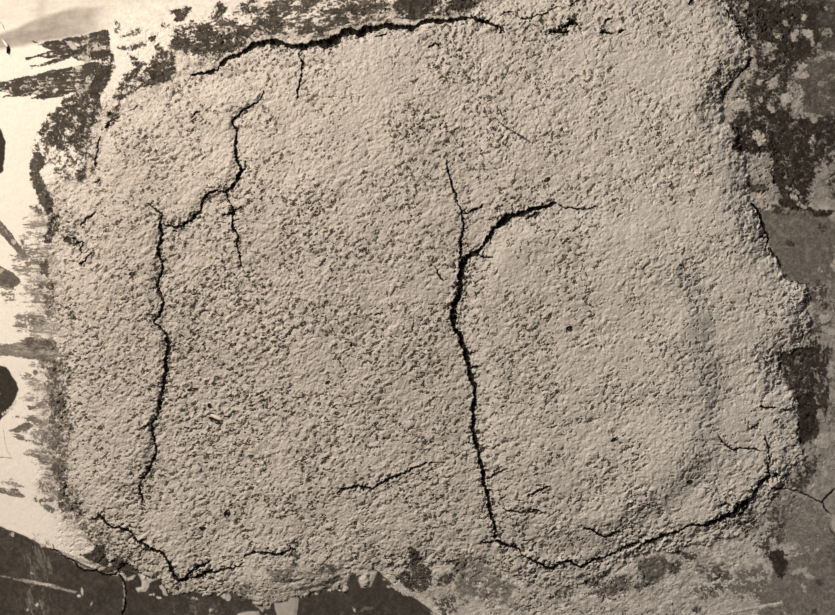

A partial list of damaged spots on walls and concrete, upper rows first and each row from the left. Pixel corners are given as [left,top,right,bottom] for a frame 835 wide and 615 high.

crack [189,0,579,99]
crack [600,18,624,35]
crack [94,105,138,183]
crack [139,91,264,506]
crack [434,160,835,571]
crack [336,462,444,494]
crack [89,514,296,582]